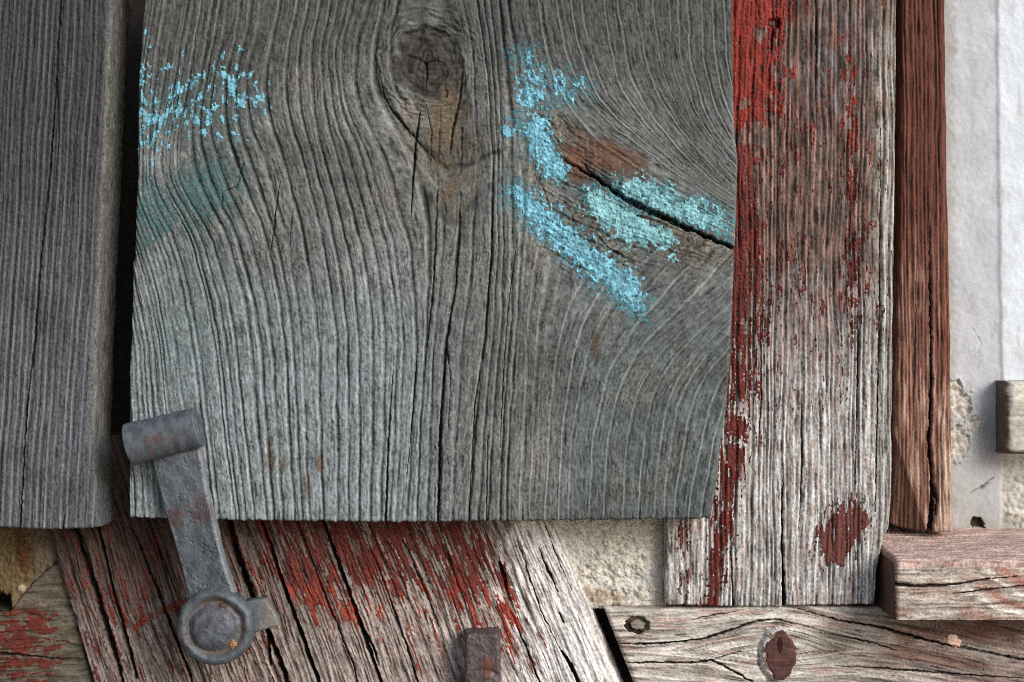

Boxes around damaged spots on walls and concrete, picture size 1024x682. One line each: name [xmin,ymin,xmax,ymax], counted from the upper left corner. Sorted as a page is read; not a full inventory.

peeling [138,29,272,194]
crack [566,162,733,250]
peeling [496,0,888,606]
crack [618,322,1024,682]
peeling [0,509,189,682]
peeling [224,519,547,682]